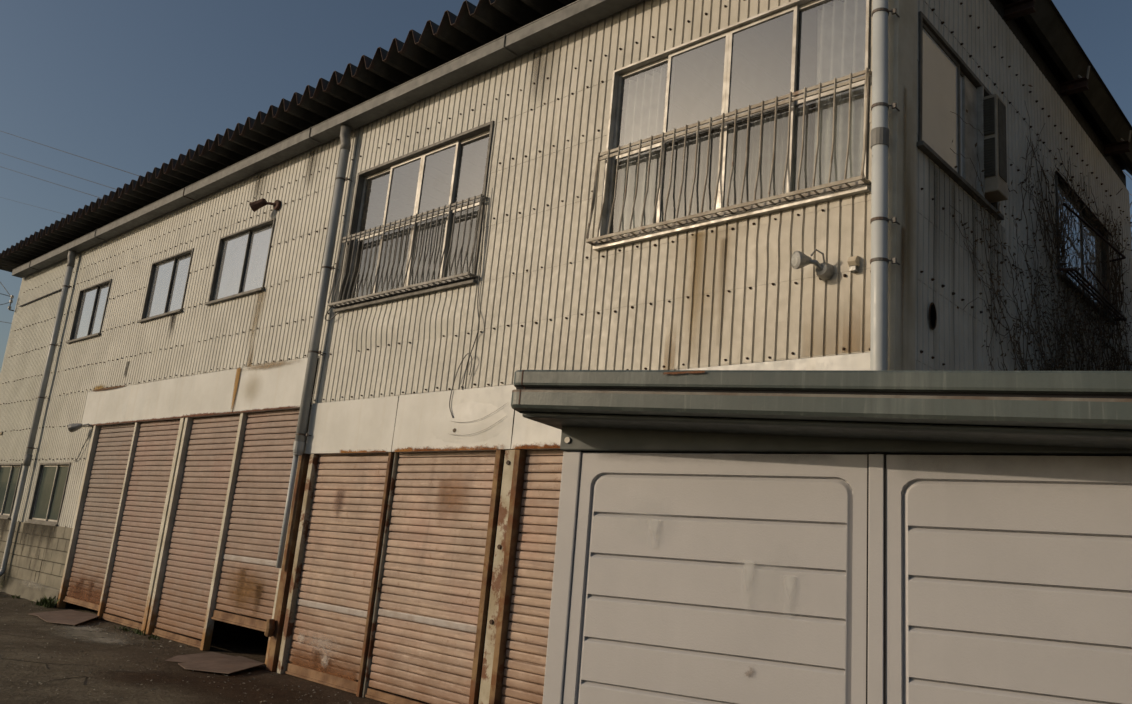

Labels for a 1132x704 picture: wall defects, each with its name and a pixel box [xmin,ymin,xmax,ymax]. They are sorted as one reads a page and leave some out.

rust [90,362,296,426]